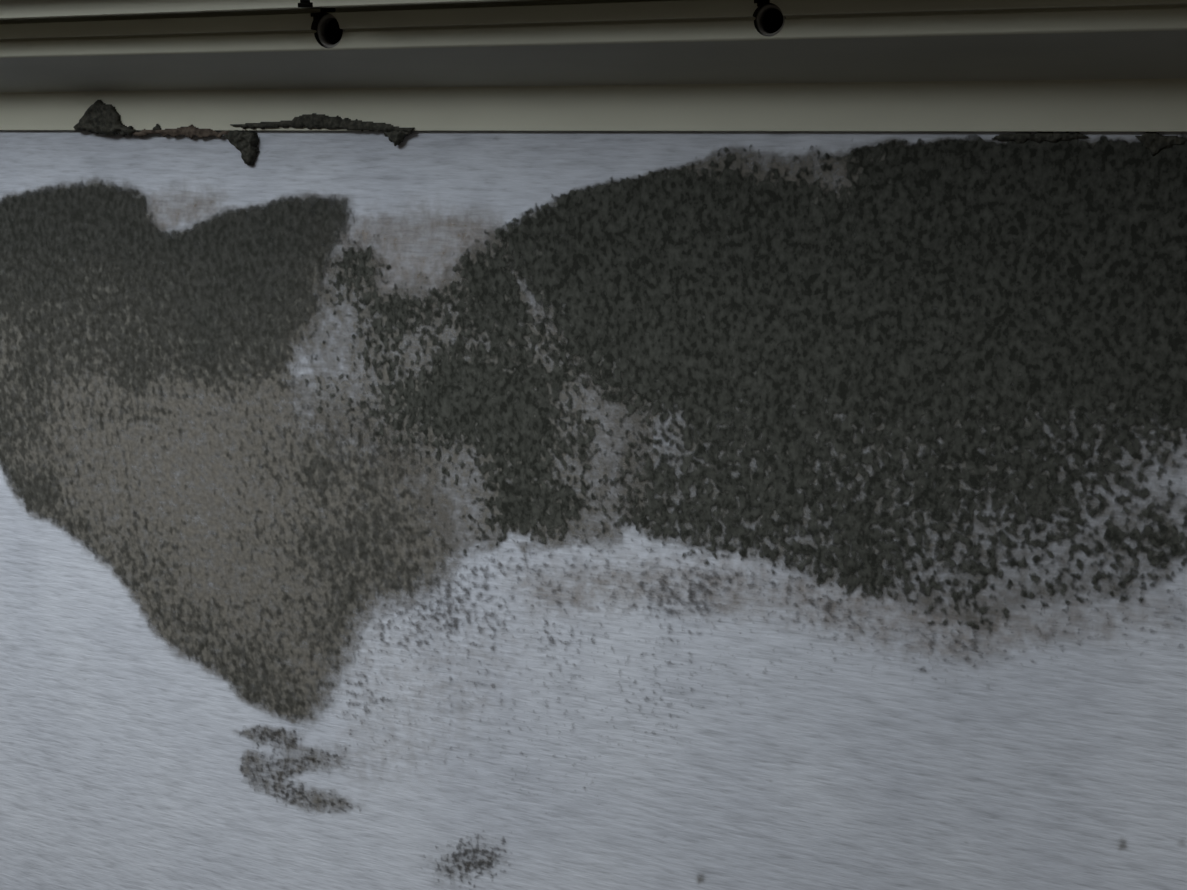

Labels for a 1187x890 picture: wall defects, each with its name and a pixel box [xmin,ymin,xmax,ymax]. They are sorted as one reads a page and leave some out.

damp [0,135,1187,811]
damp [447,845,496,883]